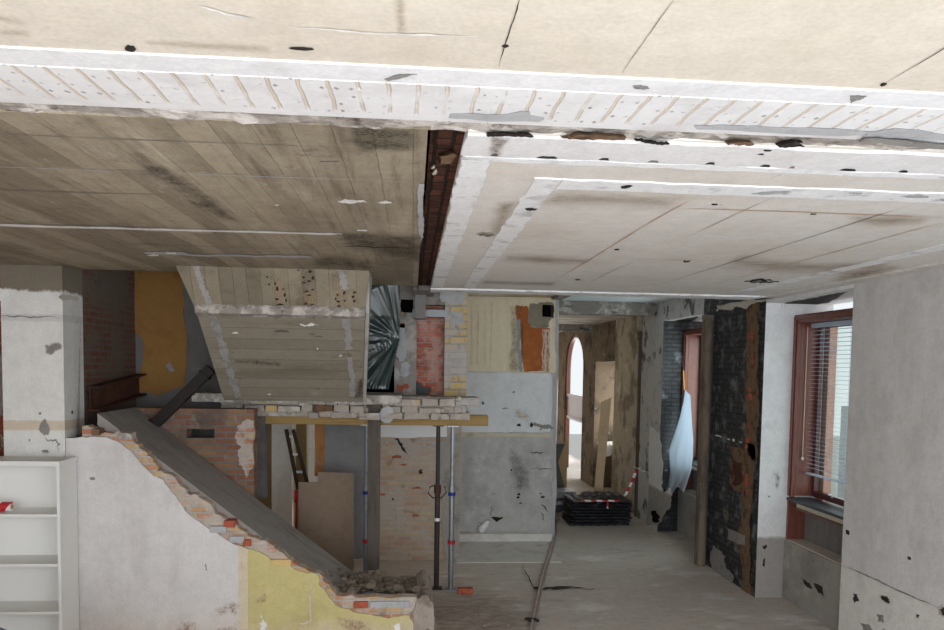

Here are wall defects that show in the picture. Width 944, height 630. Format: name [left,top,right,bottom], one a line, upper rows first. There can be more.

spalling [801,578,824,597]